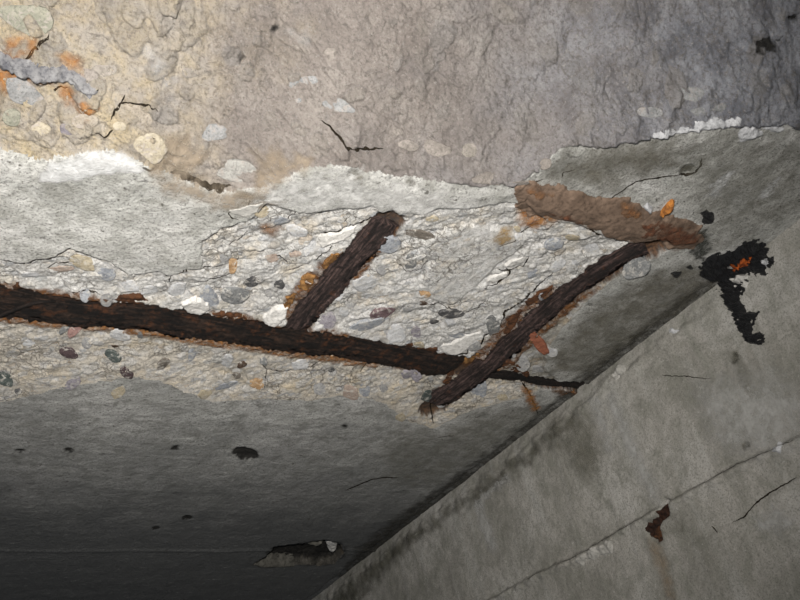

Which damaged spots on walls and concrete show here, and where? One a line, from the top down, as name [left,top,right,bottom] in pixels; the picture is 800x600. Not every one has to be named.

crack [95,95,158,138]
crack [321,120,383,152]
spalling [0,202,651,429]
corrosion [0,180,704,411]
crack [712,477,797,532]
spalling [253,540,345,568]